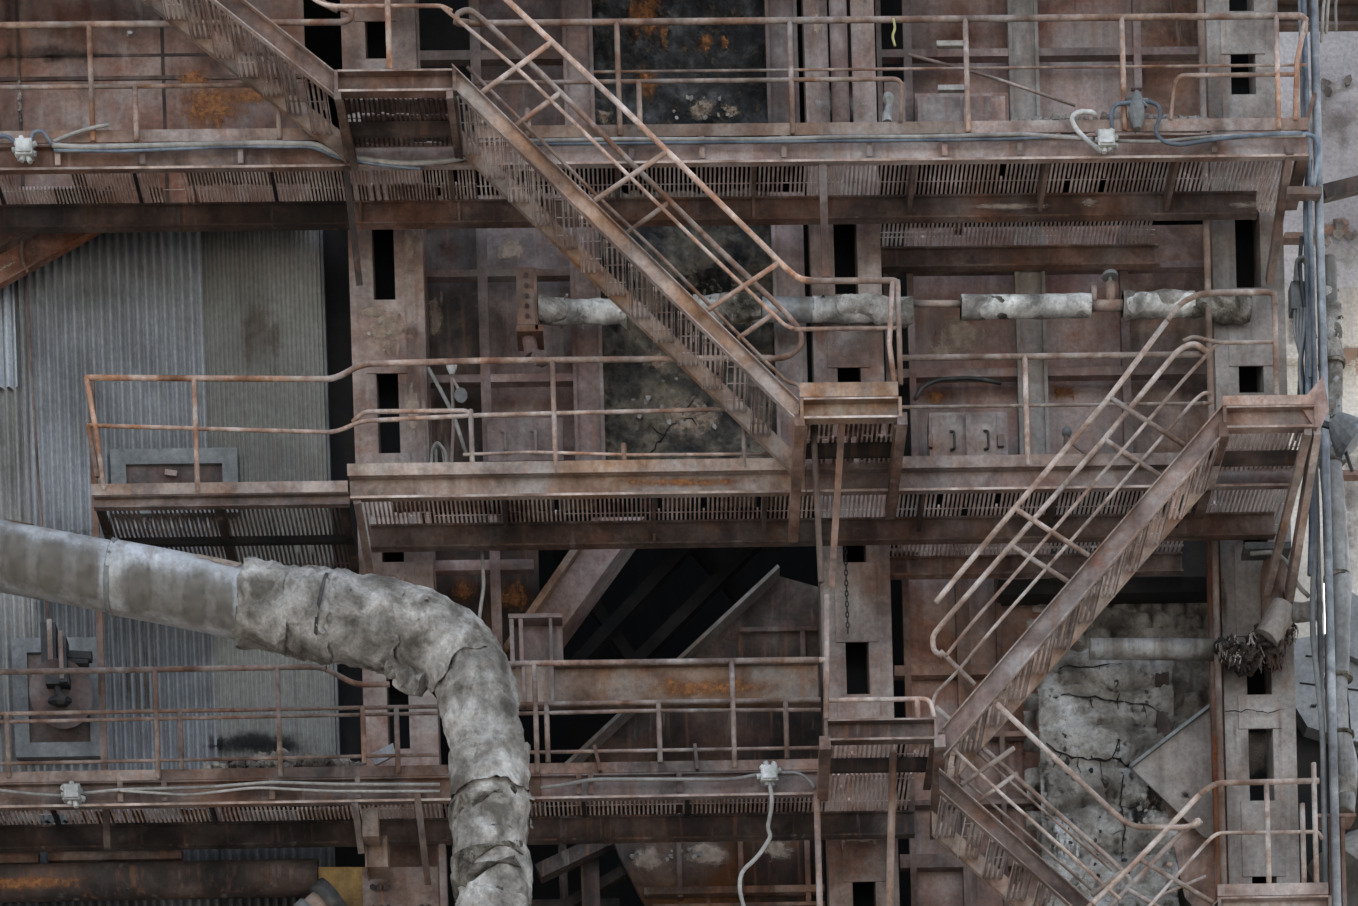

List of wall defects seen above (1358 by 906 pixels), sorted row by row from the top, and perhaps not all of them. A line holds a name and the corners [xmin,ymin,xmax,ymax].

corrosion [629,0,667,44]
corrosion [700,35,729,52]
corrosion [180,69,263,128]
crack [1046,663,1157,858]